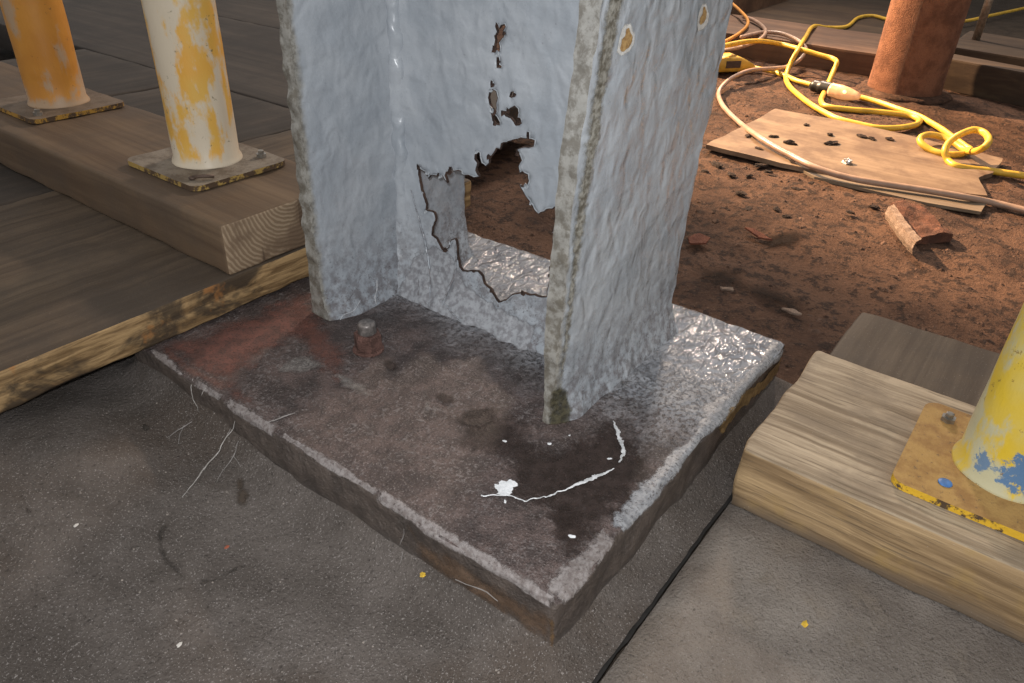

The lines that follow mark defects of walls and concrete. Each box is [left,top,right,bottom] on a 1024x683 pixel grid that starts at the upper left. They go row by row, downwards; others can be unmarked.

peeling [489,93,522,126]
leakage [461,407,646,552]